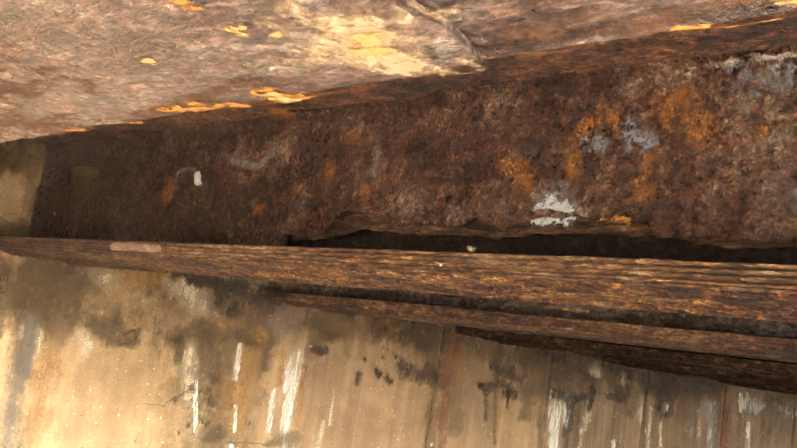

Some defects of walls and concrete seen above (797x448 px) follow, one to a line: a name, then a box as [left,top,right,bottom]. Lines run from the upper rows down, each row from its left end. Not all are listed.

rust [223,25,247,36]
rust [272,4,457,84]
rust [619,0,784,38]
rust [0,45,101,142]
peeling [727,64,797,106]
water stain [0,139,45,178]
rust [77,78,381,244]
rust [111,242,161,252]
rust [599,215,632,225]
water stain [0,258,139,448]
water stain [154,273,289,448]
water stain [266,313,797,448]